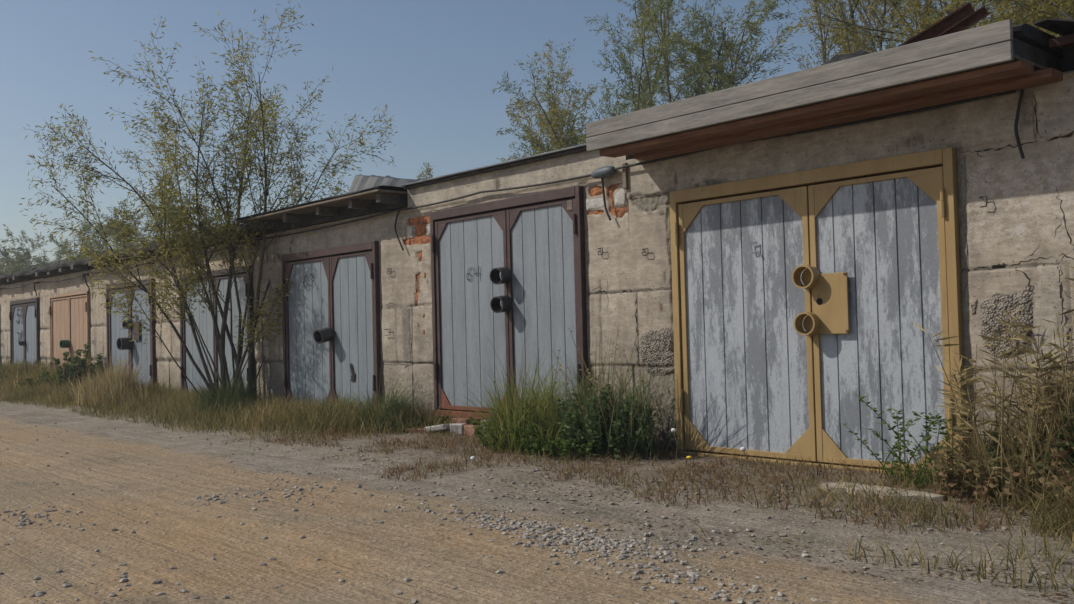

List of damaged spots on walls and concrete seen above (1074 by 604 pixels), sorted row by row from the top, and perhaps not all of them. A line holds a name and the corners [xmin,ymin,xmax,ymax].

crack [959,93,1074,157]
flaking render [586,182,671,252]
flaking render [402,216,431,335]
spalling [957,155,1034,359]
spalling [639,328,675,376]